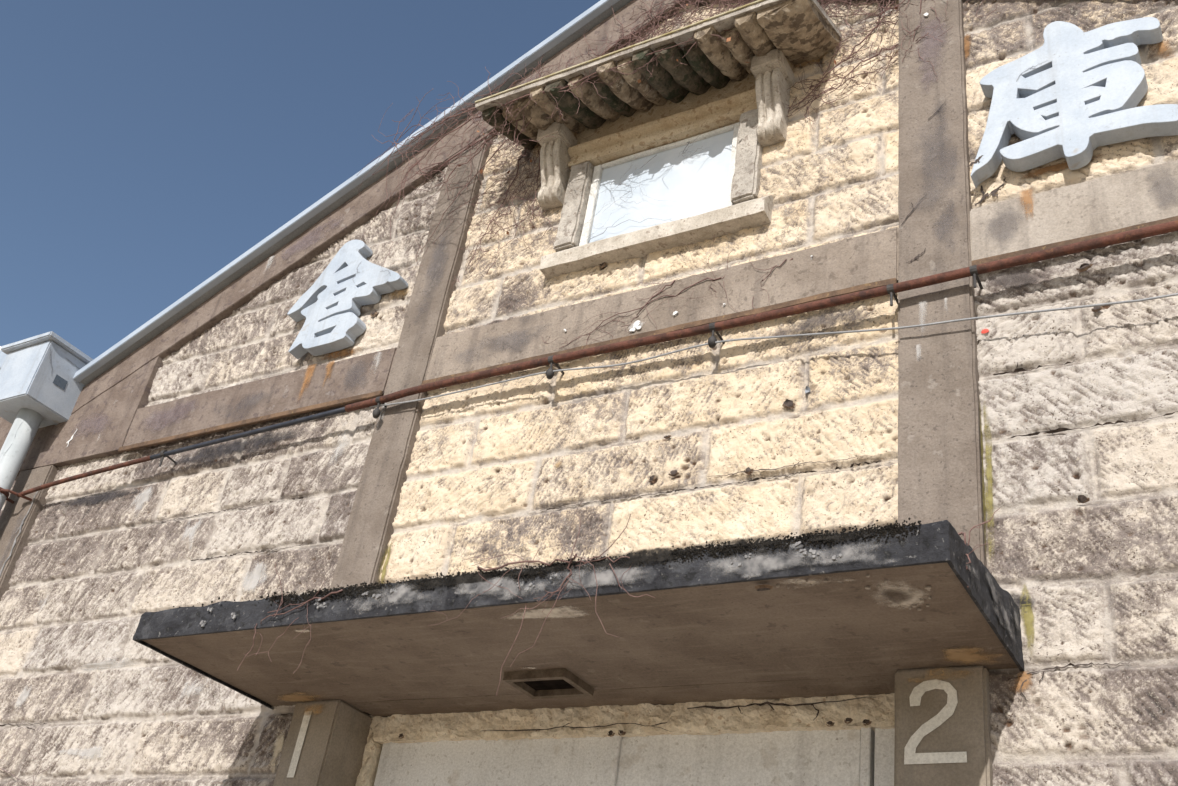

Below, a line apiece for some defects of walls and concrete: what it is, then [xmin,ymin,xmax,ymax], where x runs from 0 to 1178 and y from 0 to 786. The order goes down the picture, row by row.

corrosion [301,349,355,391]
water stain [412,538,775,591]
crack [483,697,866,732]